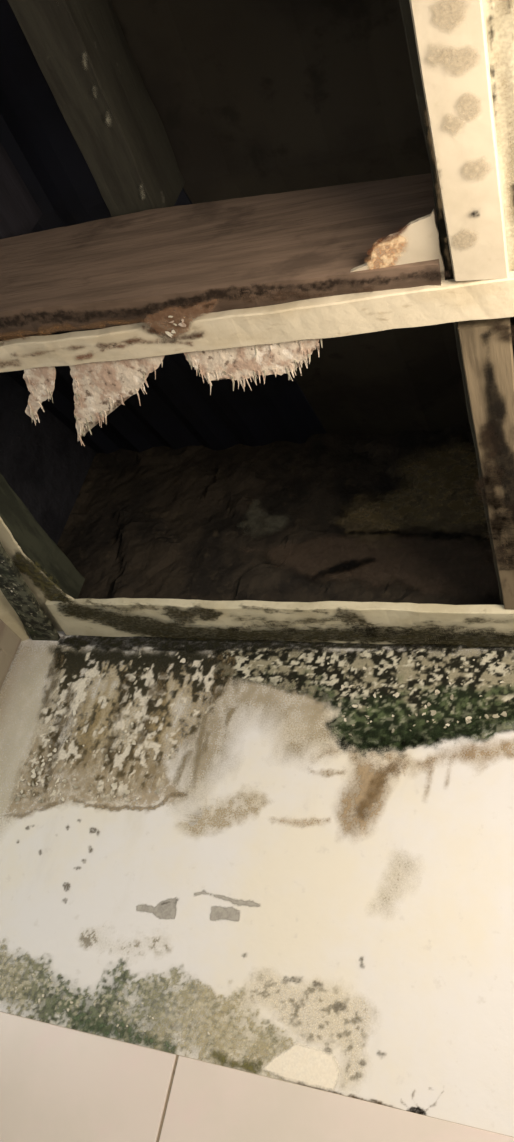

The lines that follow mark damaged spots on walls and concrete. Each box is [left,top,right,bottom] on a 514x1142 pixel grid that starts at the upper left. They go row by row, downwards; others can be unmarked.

damp [495,0,514,19]
damp [494,54,514,222]
damp [483,321,514,343]
damp [476,361,514,571]
damp [0,552,514,834]
peeling [9,738,186,817]
peeling [136,898,178,919]
peeling [210,906,240,921]
damp [0,945,366,1081]